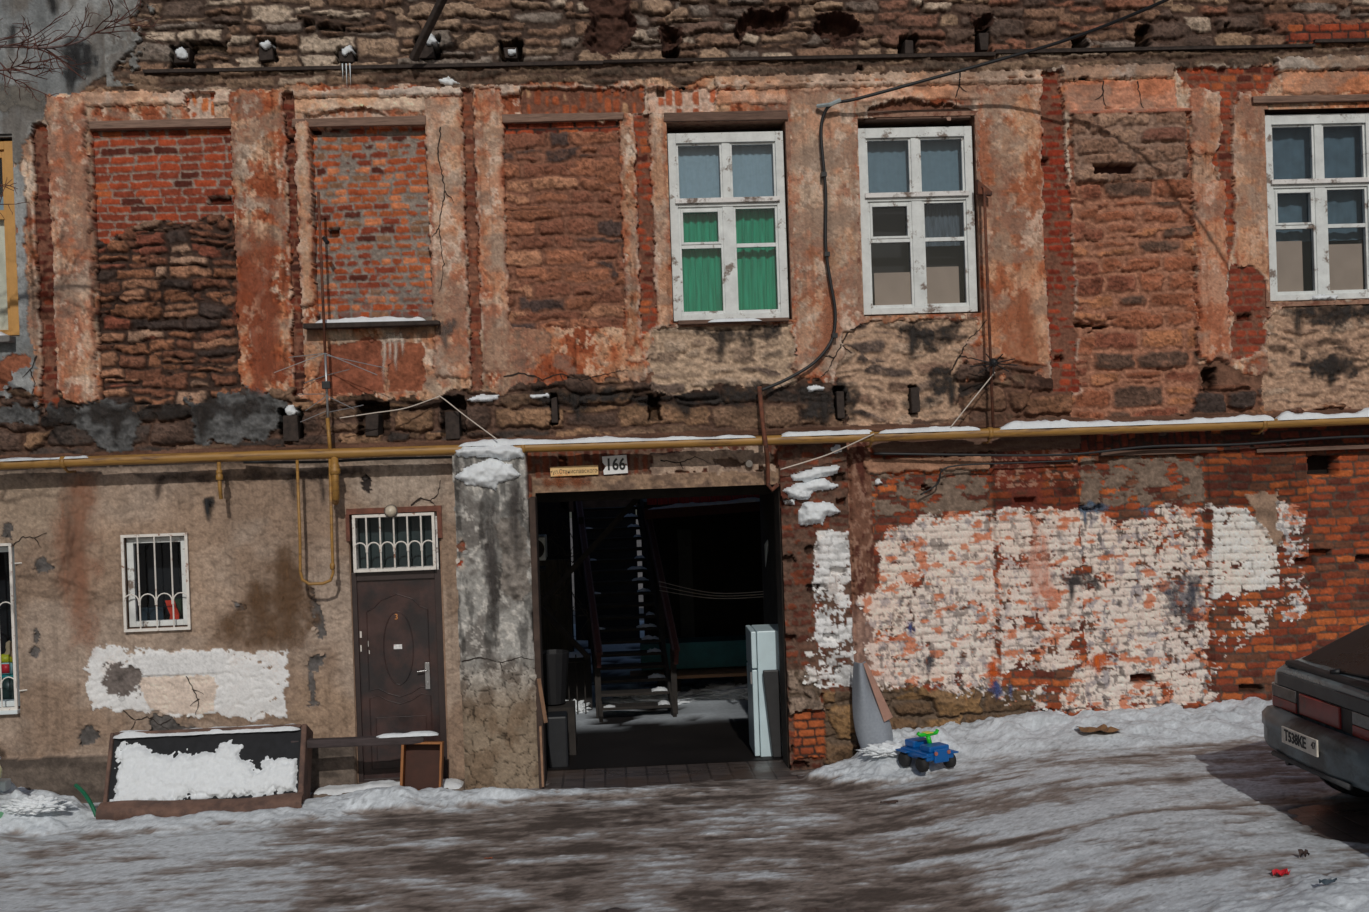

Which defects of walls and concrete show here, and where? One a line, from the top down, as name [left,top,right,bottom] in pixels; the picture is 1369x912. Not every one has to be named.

spalling [583,0,638,60]
spalling [658,25,689,58]
spalling [733,6,791,51]
spalling [812,10,865,50]
flaking render [0,124,60,413]
flaking render [836,314,979,427]
water stain [221,548,319,646]
peeling [802,501,1311,714]